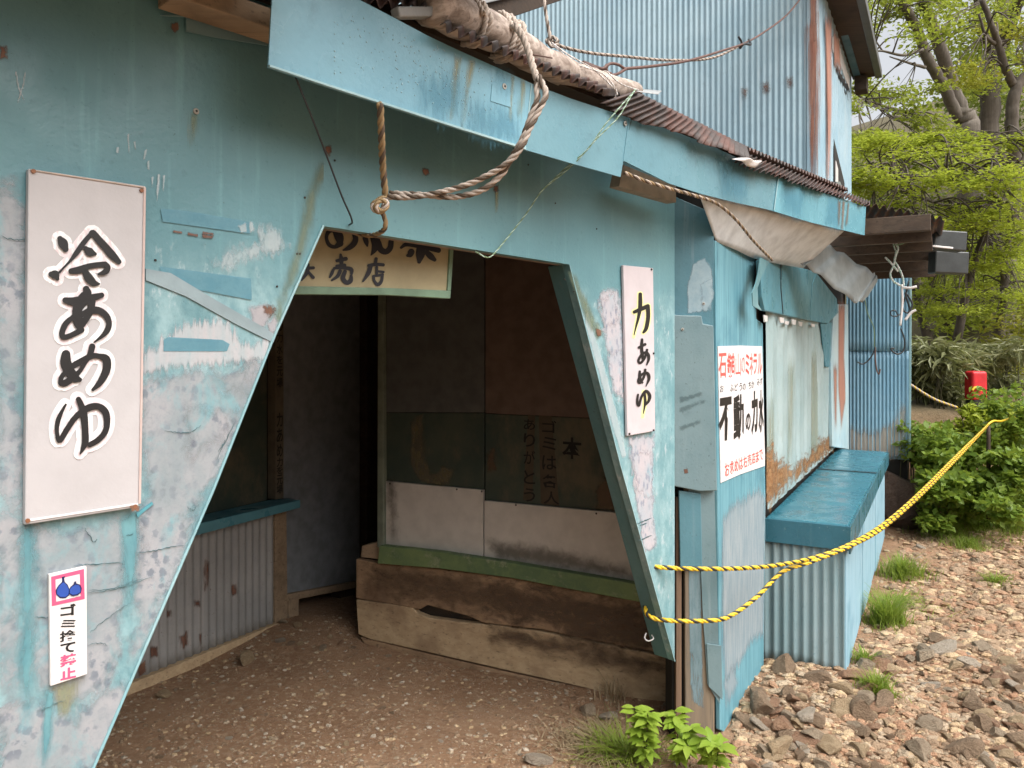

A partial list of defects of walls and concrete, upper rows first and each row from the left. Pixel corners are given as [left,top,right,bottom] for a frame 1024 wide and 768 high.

corrosion [808,0,840,178]
peeling [687,259,714,313]
peeling [598,289,624,398]
peeling [0,189,277,768]
corrosion [766,437,834,509]
crack [74,530,182,645]
corrosion [138,647,158,676]